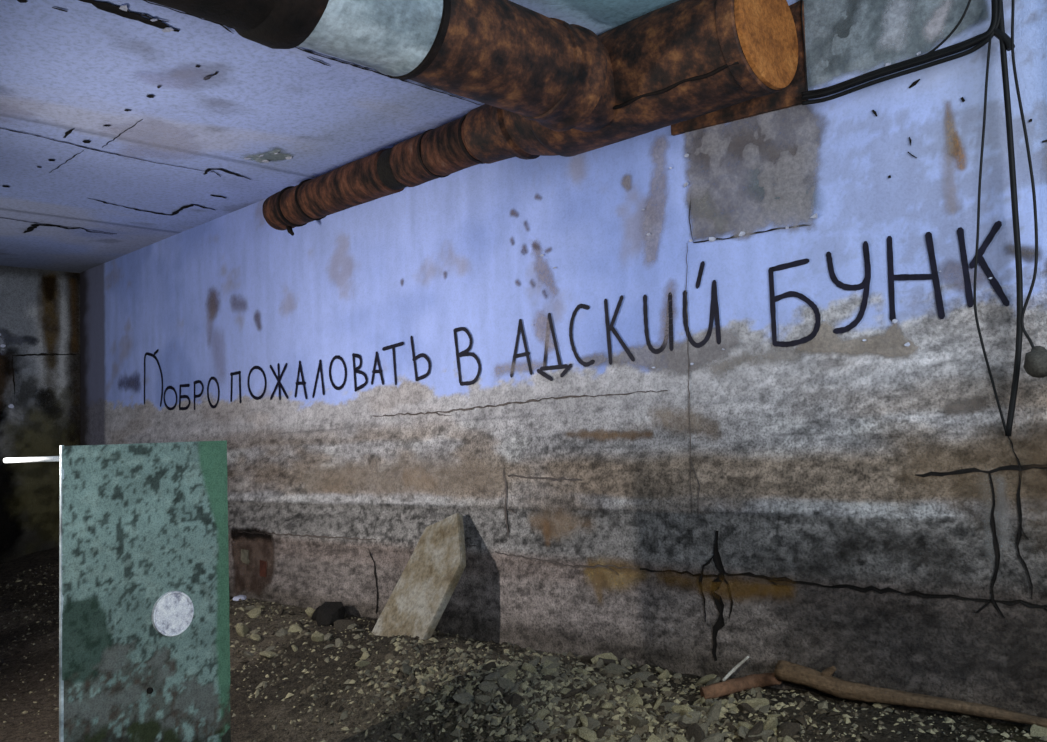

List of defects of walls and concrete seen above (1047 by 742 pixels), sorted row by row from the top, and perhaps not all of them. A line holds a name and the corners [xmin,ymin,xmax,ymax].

crack [52,0,234,33]
crack [295,47,480,105]
corrosion [409,0,615,132]
crack [0,217,114,234]
crack [0,119,251,216]
peeling [642,138,672,262]
spalling [684,104,824,242]
crack [373,199,1047,661]